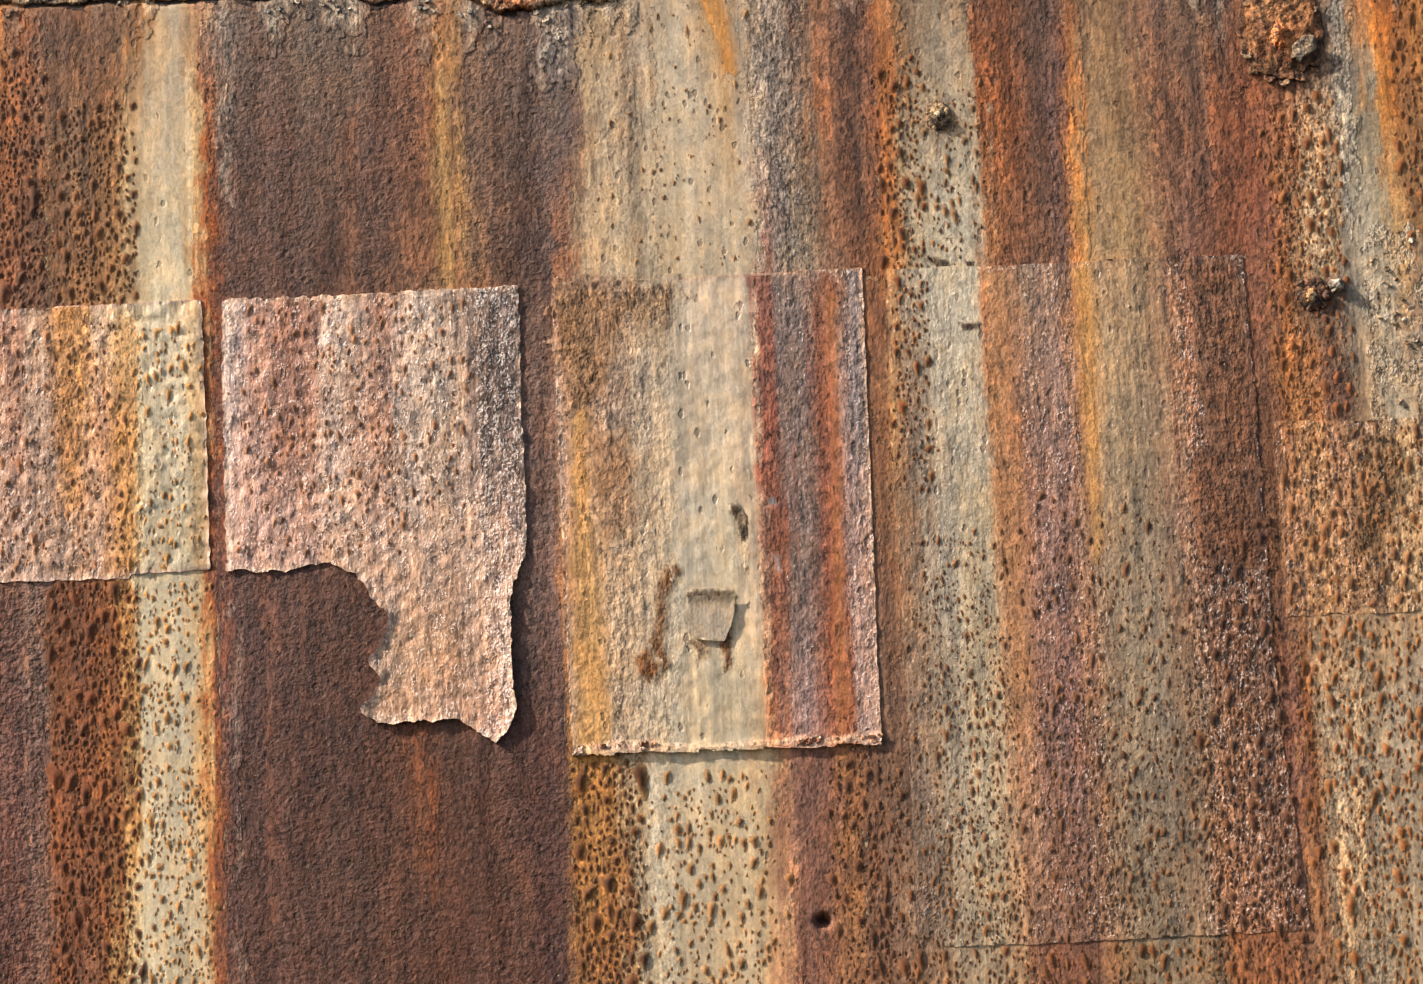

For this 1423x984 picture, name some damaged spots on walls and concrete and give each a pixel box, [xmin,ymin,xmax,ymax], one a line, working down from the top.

corrosion [0,0,752,984]
corrosion [652,0,1423,984]